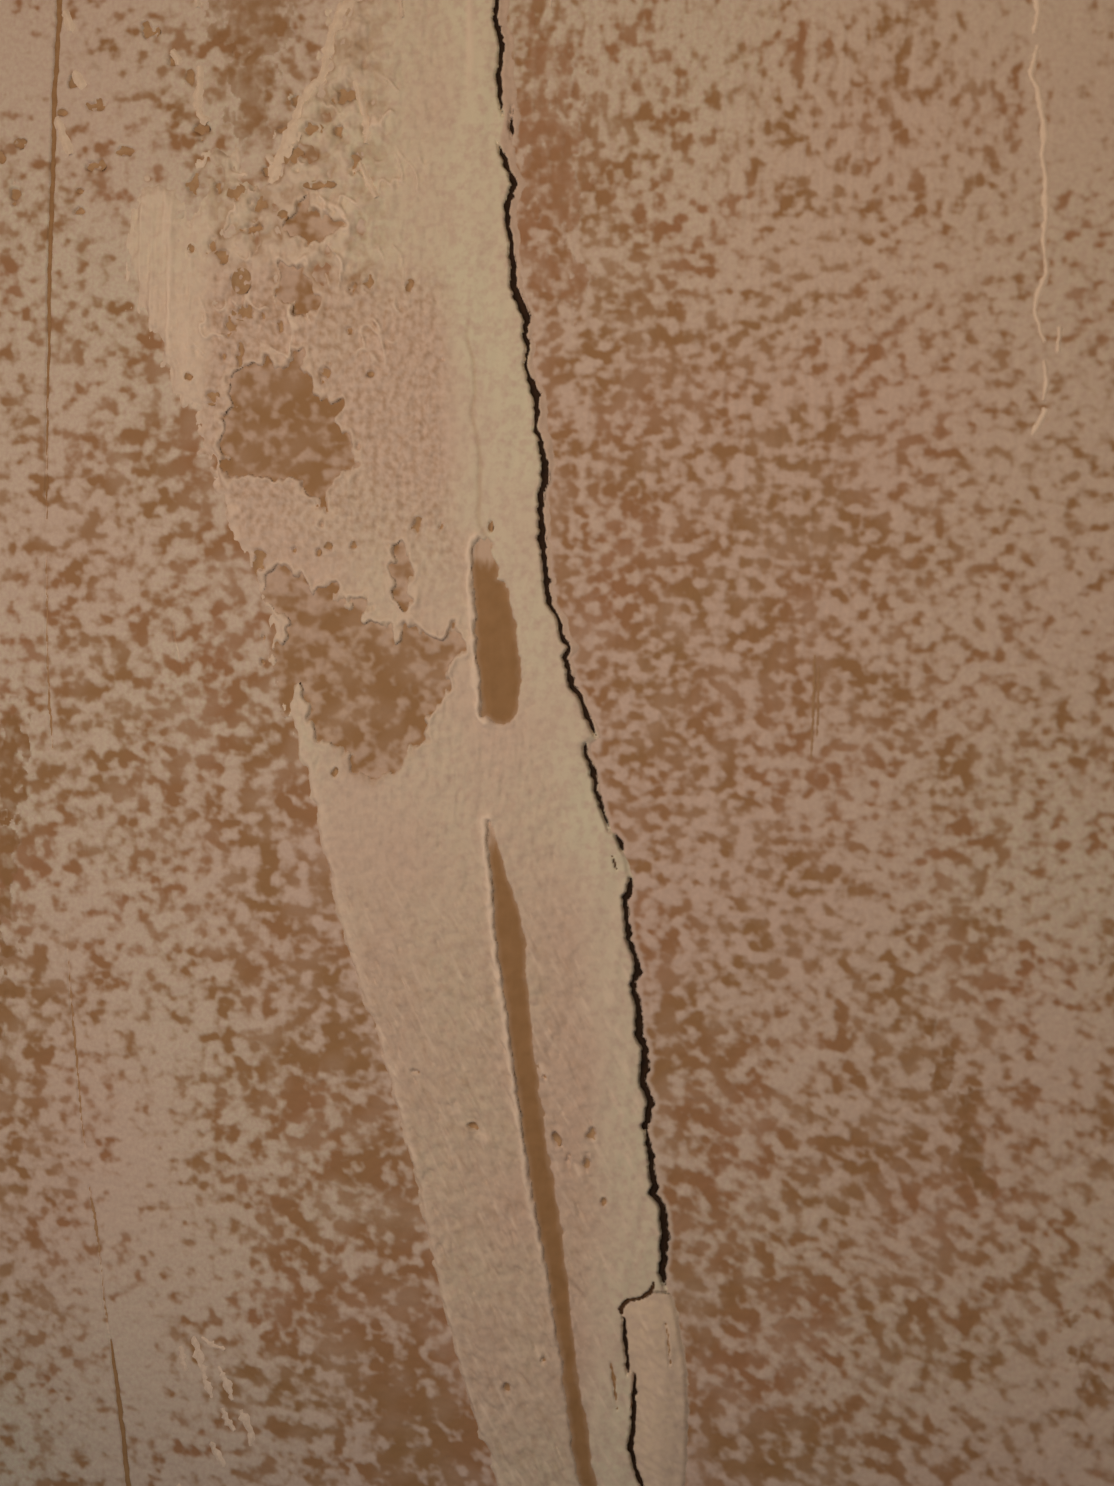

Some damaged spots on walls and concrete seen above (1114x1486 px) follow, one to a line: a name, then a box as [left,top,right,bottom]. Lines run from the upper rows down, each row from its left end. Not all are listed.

flaking render [86,98,105,111]
flaking render [170,58,195,86]
flaking render [0,138,27,164]
flaking render [88,146,135,171]
flaking render [263,122,343,176]
peeling [185,173,345,245]
crack [1028,0,1063,435]
peeling [187,241,360,556]
peeling [253,517,522,779]
crack [493,0,670,1486]
hole [488,822,597,1486]